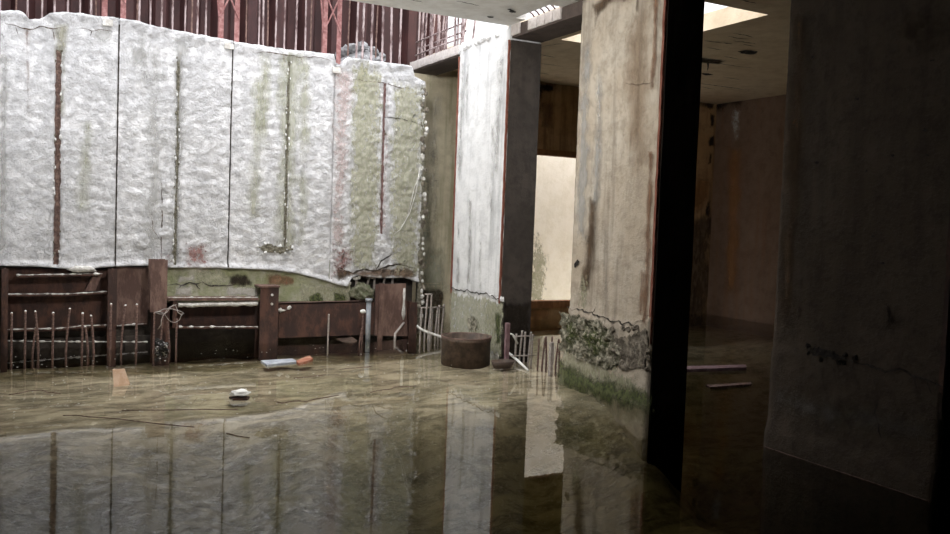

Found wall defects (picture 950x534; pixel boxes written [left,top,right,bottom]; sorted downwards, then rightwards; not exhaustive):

water stain [280,54,309,182]
rust [186,243,208,264]
crack [567,306,650,330]
water stain [558,360,650,413]